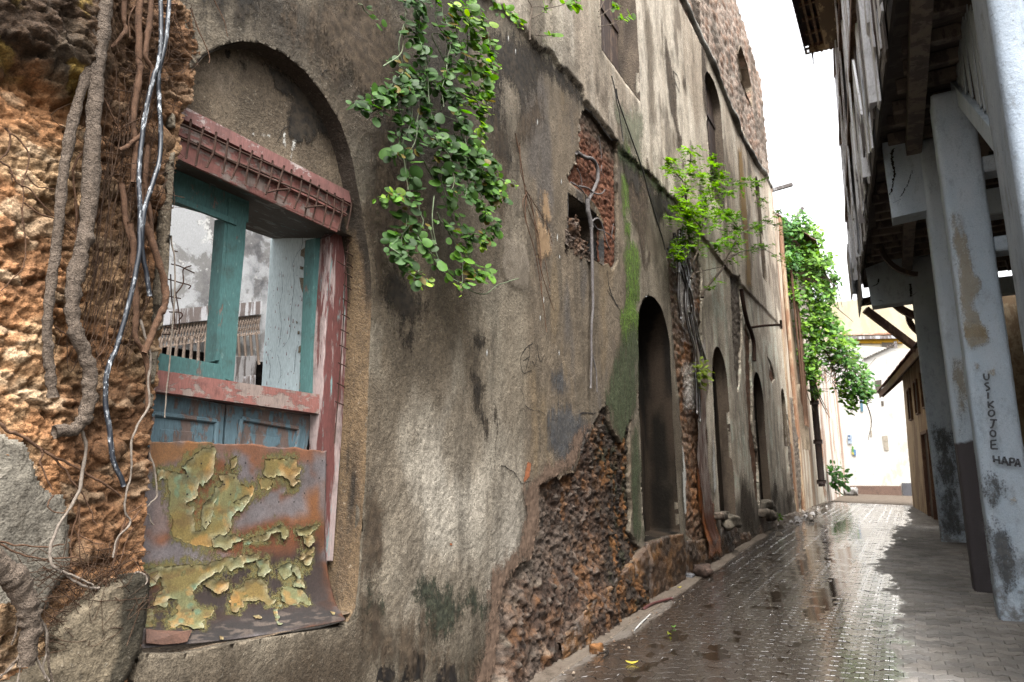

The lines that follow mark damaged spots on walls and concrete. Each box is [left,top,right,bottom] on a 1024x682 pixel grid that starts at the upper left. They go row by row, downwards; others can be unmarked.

damp [488,26,584,216]
flaking render [565,111,616,268]
crack [889,147,912,203]
flaking render [0,0,353,660]
flaking render [666,237,708,540]
peeling [951,215,989,347]
peeling [473,422,594,682]
damp [931,422,964,538]
damp [981,471,1018,593]
flaking render [0,628,28,681]